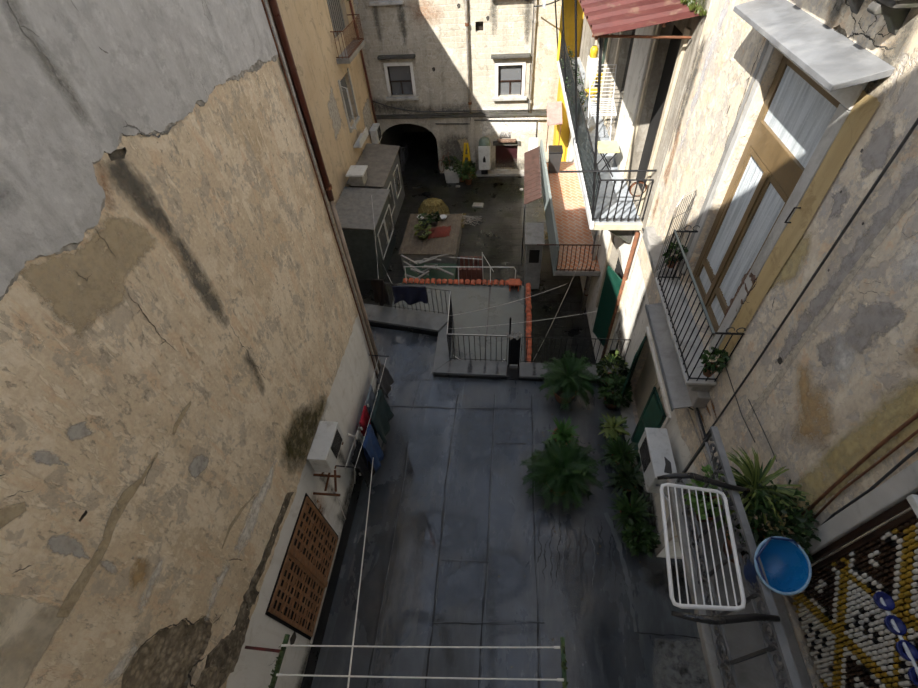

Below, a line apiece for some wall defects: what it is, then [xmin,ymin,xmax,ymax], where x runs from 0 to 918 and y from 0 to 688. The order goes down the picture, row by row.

crack [833,0,891,58]
spalling [226,54,278,81]
flaking render [92,123,175,180]
damp [108,155,222,318]
spalling [0,255,43,301]
flaking render [121,492,294,688]